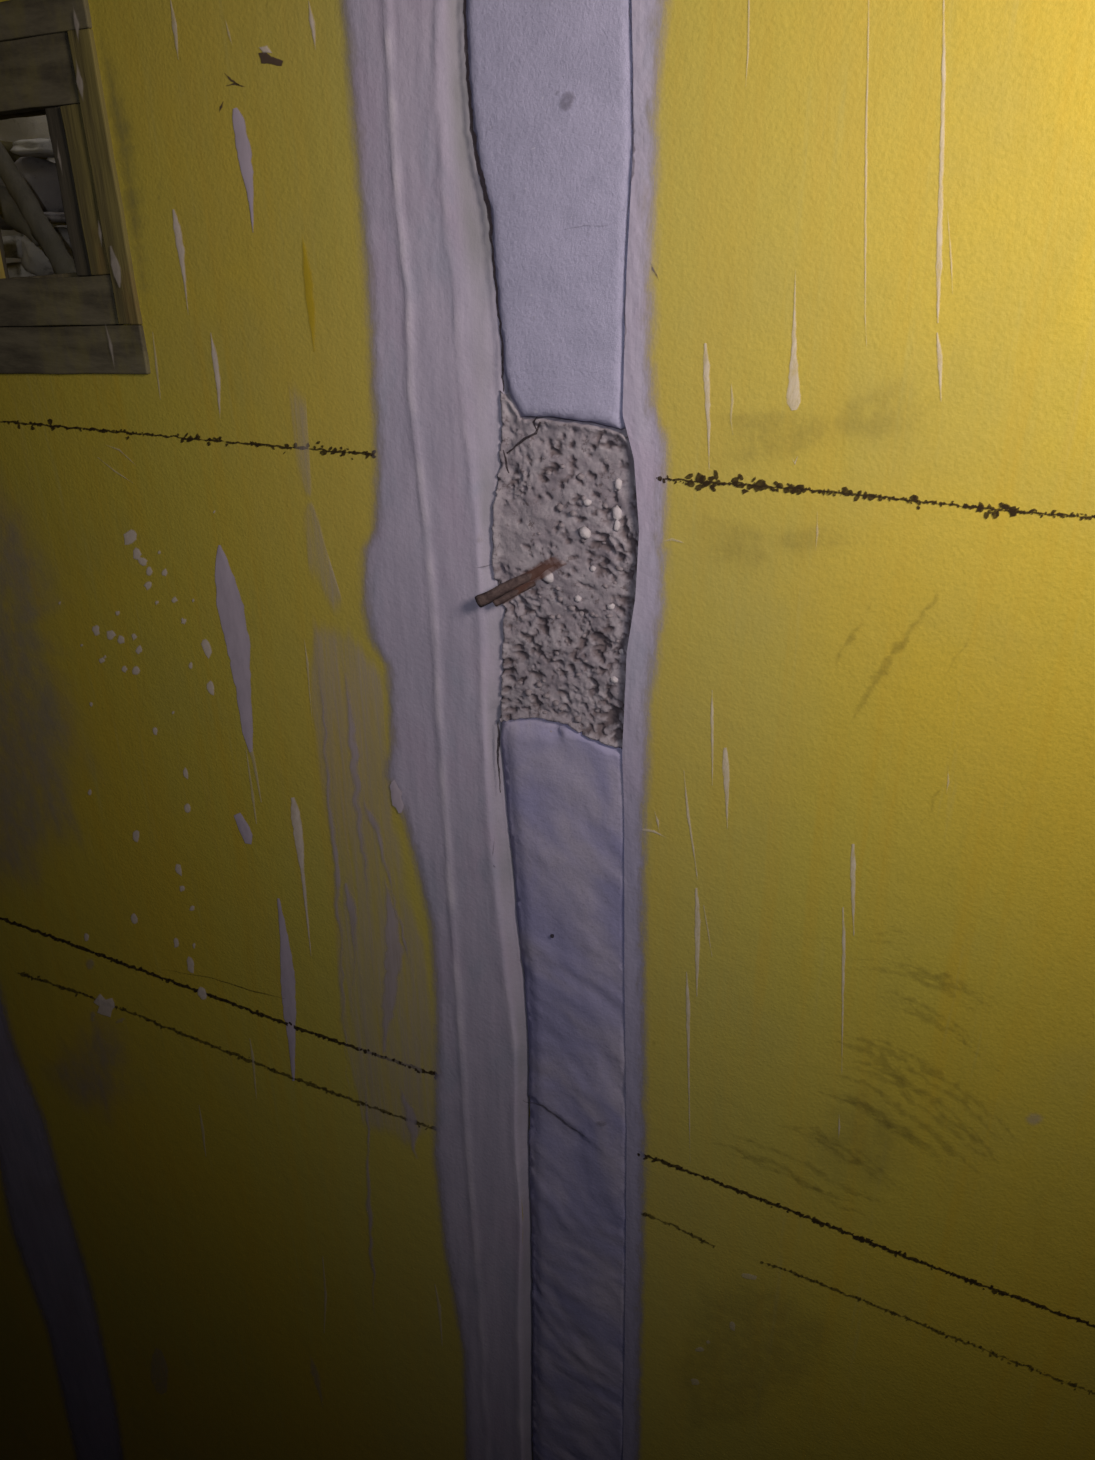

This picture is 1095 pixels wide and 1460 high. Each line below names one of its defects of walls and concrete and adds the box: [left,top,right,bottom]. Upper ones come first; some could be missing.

crack [463,0,504,392]
crack [503,417,541,473]
spalling [491,388,639,749]